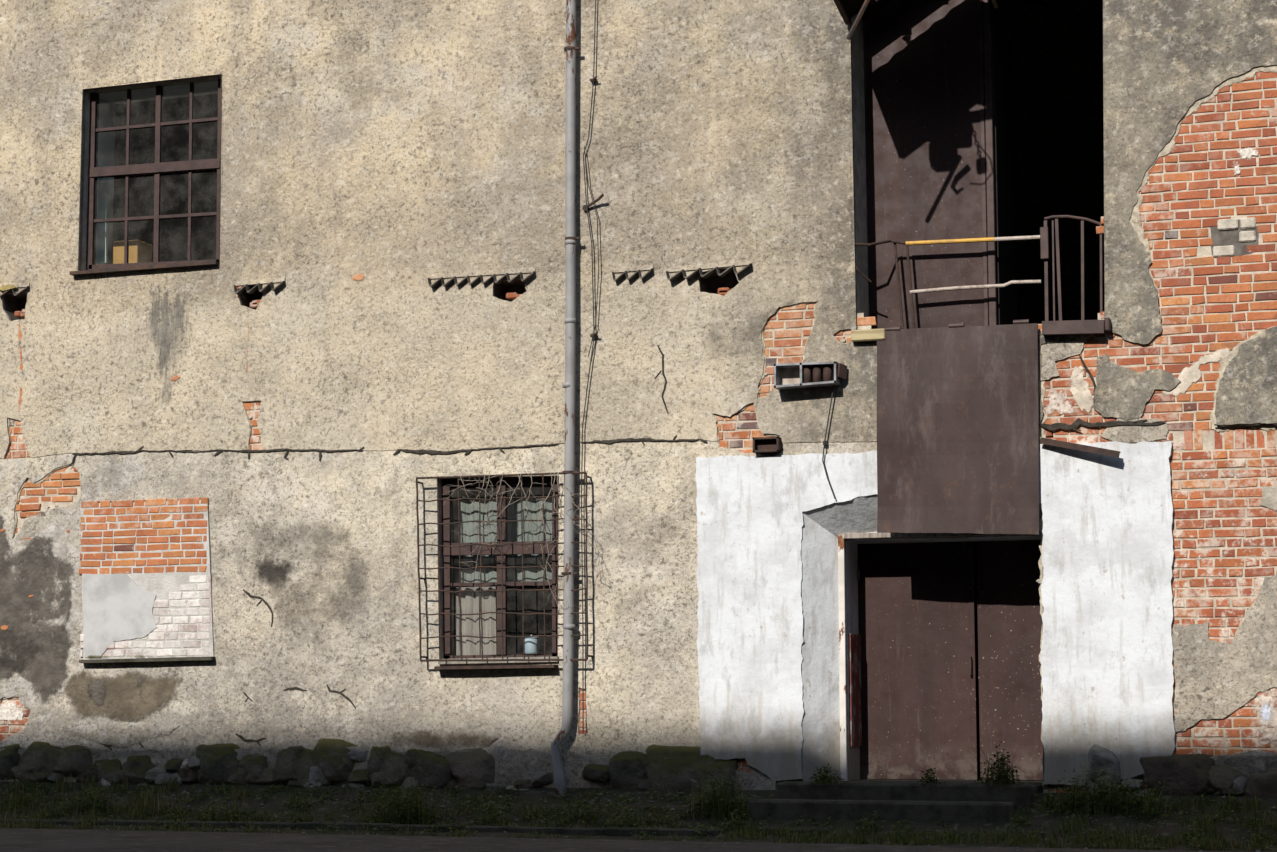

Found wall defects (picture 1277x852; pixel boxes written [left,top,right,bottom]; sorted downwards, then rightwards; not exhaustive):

spalling [4,293,27,370]
spalling [1,388,31,459]
spalling [0,453,81,540]
crack [69,446,364,466]
spalling [243,401,264,450]
crack [393,345,707,455]
spalling [705,302,817,454]
spalling [1038,65,1277,756]
water stain [0,516,177,723]
spalling [0,697,30,742]